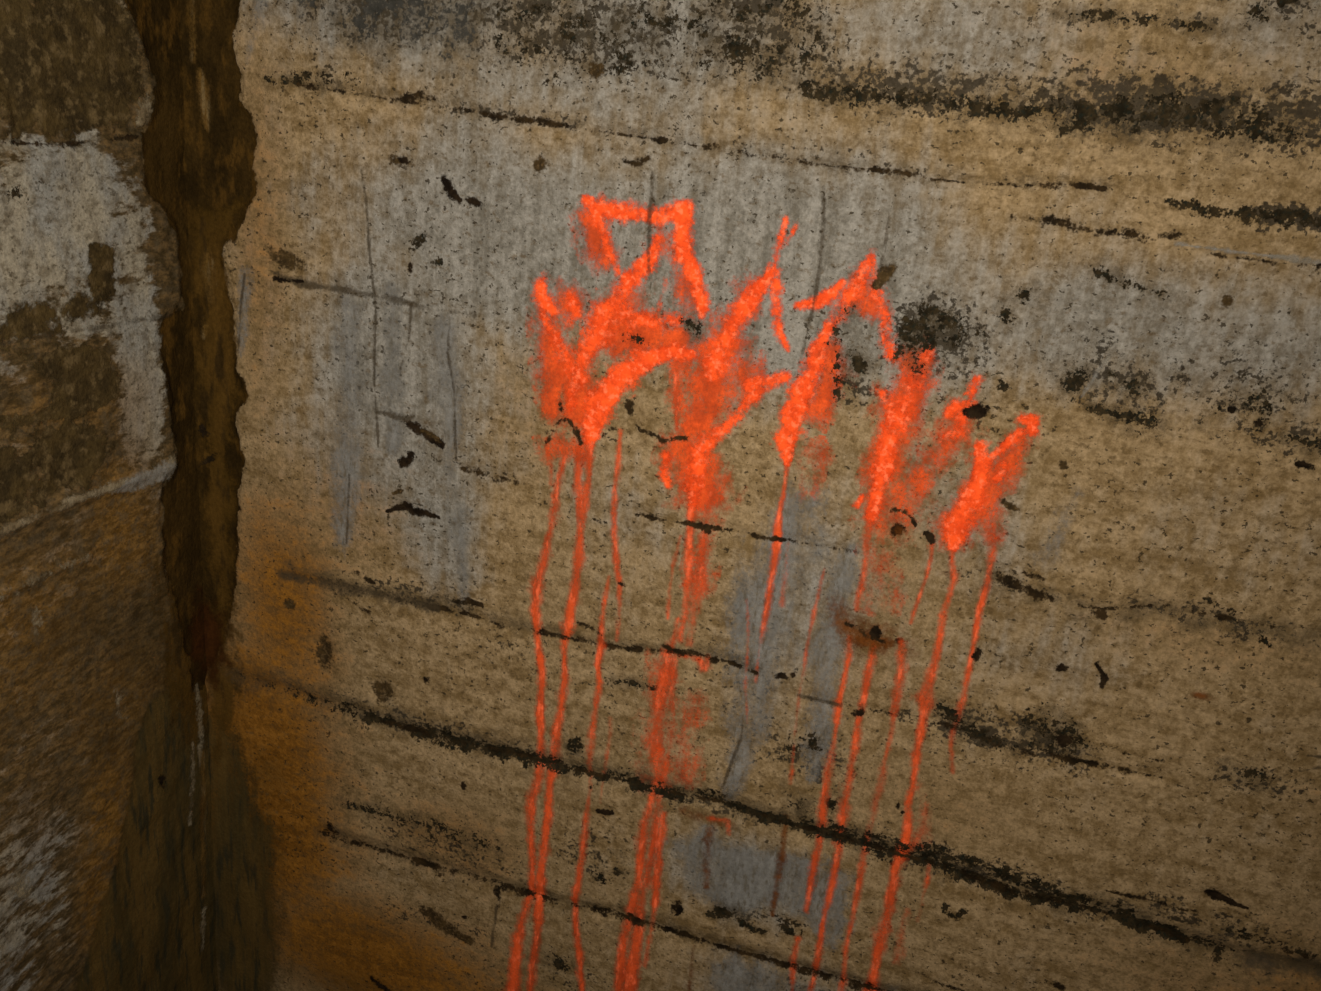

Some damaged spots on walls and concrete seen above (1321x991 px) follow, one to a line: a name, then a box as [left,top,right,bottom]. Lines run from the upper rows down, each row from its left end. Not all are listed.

leakage [264,65,362,96]
leakage [290,0,1307,147]
leakage [565,735,585,753]
leakage [1241,766,1276,786]
leakage [75,678,287,991]
leakage [342,800,502,851]
leakage [591,867,623,886]
leakage [677,825,849,948]